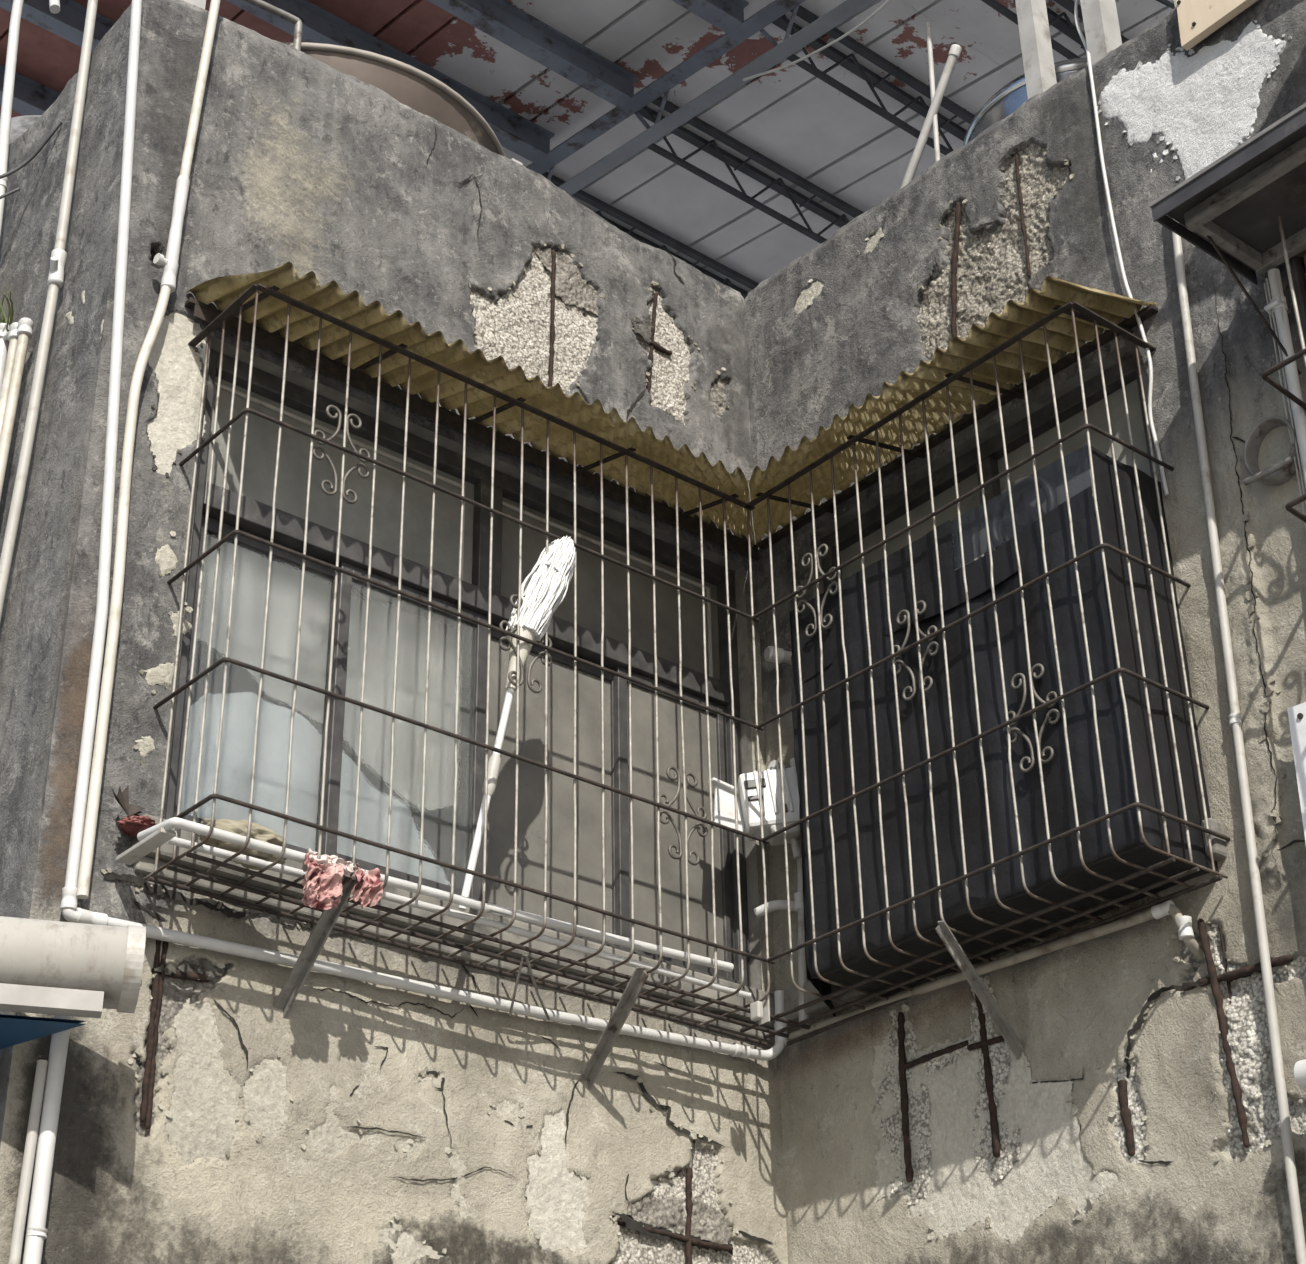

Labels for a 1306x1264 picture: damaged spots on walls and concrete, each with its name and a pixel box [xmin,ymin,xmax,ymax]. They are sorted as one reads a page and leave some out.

peeling [1097,20,1292,181]
peeling [147,306,212,477]
spalling [467,243,605,404]
spalling [917,141,1074,362]
crack [100,868,365,942]
crack [309,965,478,1018]
crack [350,1046,452,1143]
crack [388,1166,516,1182]
crack [615,1062,725,1177]
spalling [609,1138,773,1264]
peeling [871,976,1119,1242]
spalling [1166,918,1306,1162]